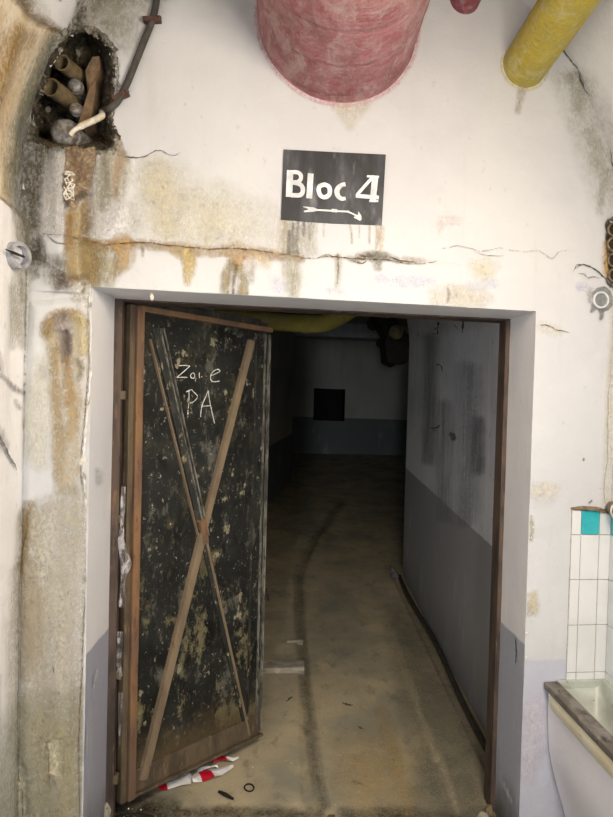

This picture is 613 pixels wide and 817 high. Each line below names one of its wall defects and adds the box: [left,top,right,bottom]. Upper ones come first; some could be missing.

leakage [71,0,148,38]
spalling [21,3,126,209]
crack [563,51,590,96]
leakage [11,47,73,342]
corrosion [65,197,302,296]
crack [0,196,436,284]
crack [450,245,613,287]
crack [0,270,32,817]
crack [78,554,86,815]